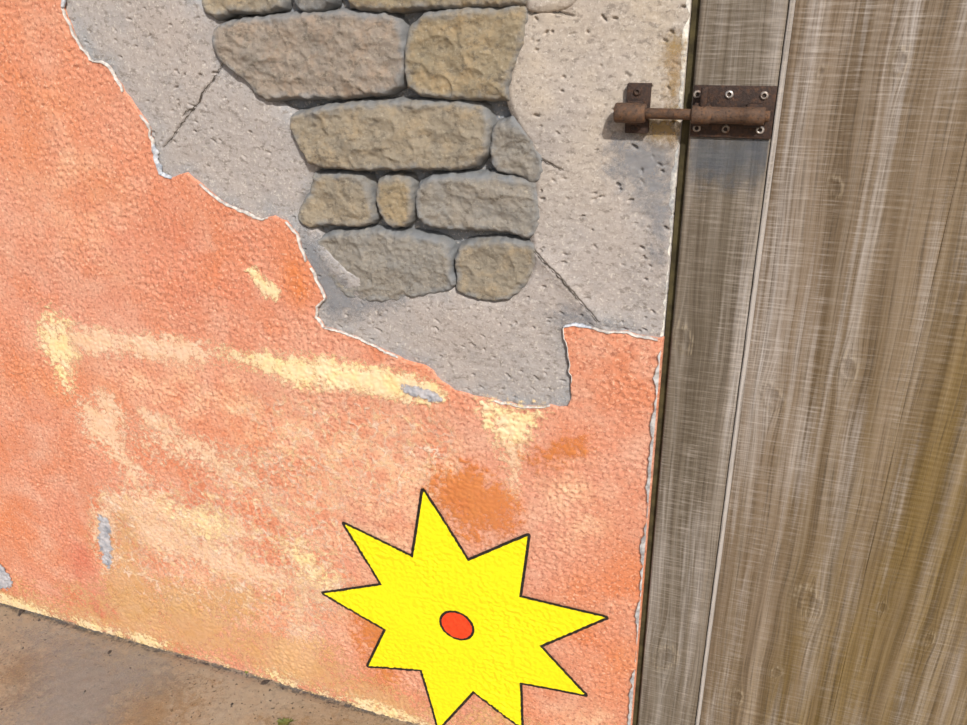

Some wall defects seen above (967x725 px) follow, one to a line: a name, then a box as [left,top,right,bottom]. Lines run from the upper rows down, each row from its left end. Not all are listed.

crack [164,65,222,147]
rust [650,119,681,141]
crack [534,252,597,322]
peeling [61,0,693,725]
peeling [0,565,13,590]